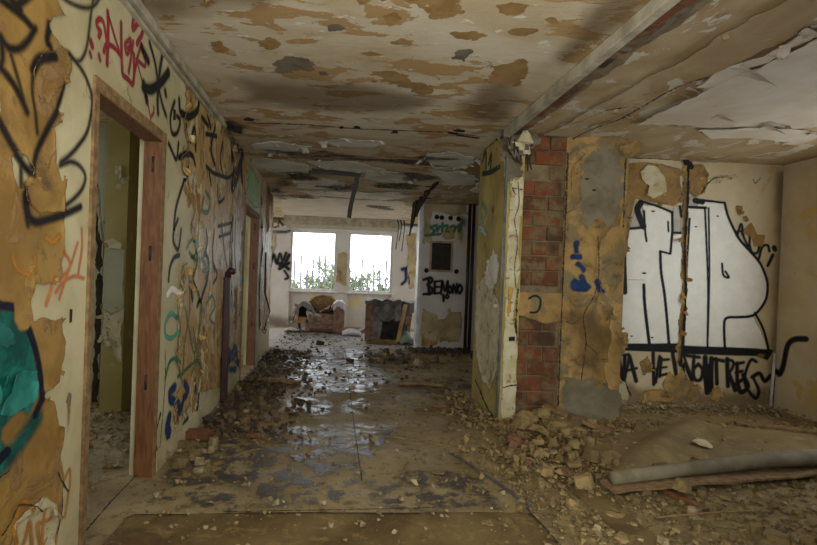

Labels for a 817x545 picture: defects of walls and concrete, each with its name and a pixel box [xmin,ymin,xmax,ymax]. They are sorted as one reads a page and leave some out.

spalling [247,37,281,50]
spalling [272,56,329,75]
spalling [328,24,345,32]
spalling [390,38,412,46]
spalling [370,71,434,95]
spalling [405,0,465,20]
peeling [0,0,73,545]
crack [90,182,104,402]
peeling [173,82,420,430]
peeling [415,0,817,420]
crack [557,77,718,407]
crack [156,351,166,451]